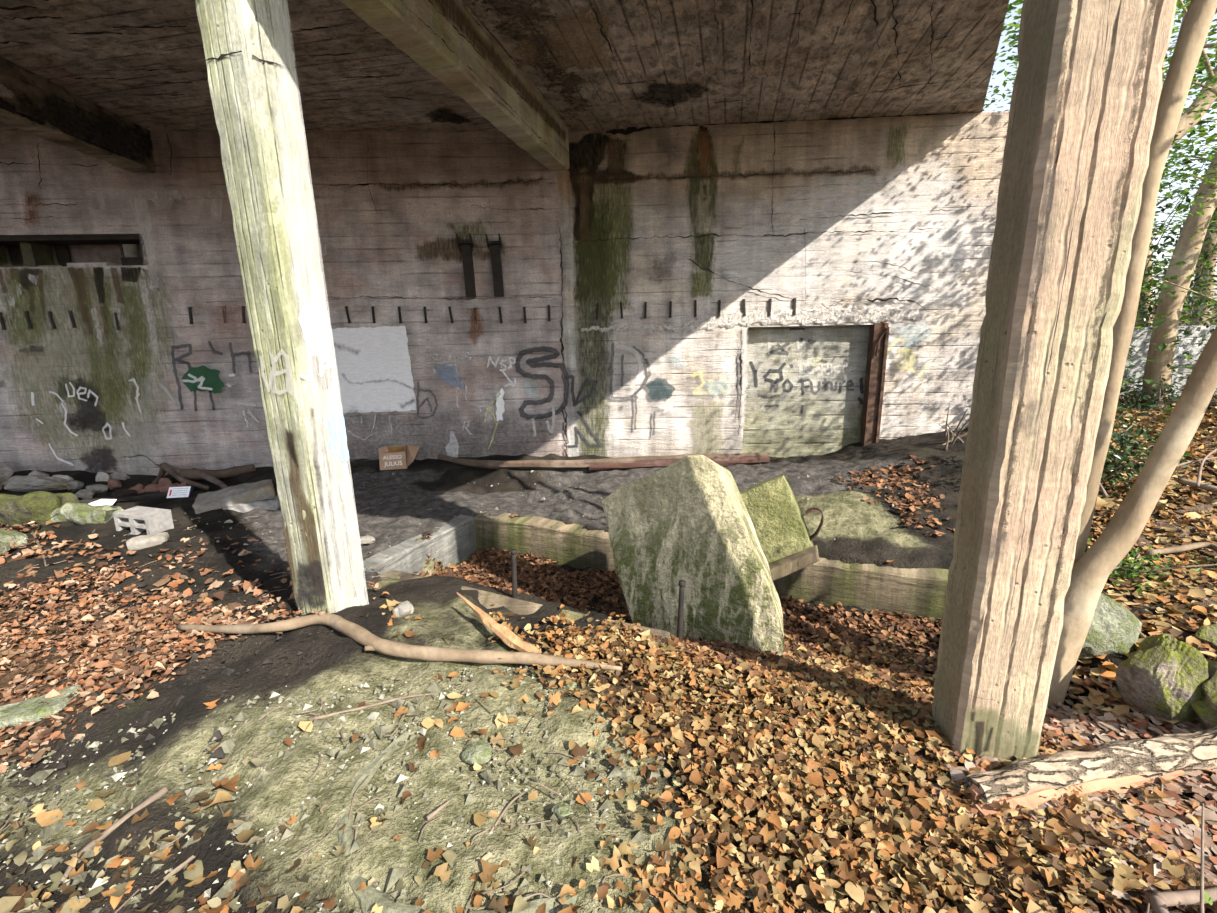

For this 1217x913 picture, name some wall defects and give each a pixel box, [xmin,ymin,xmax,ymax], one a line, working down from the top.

crack [0,104,172,220]
crack [0,0,187,44]
crack [74,27,419,101]
damp [435,0,643,456]
crack [319,0,962,457]
damp [637,83,709,108]
damp [684,130,717,297]
damp [0,267,169,460]